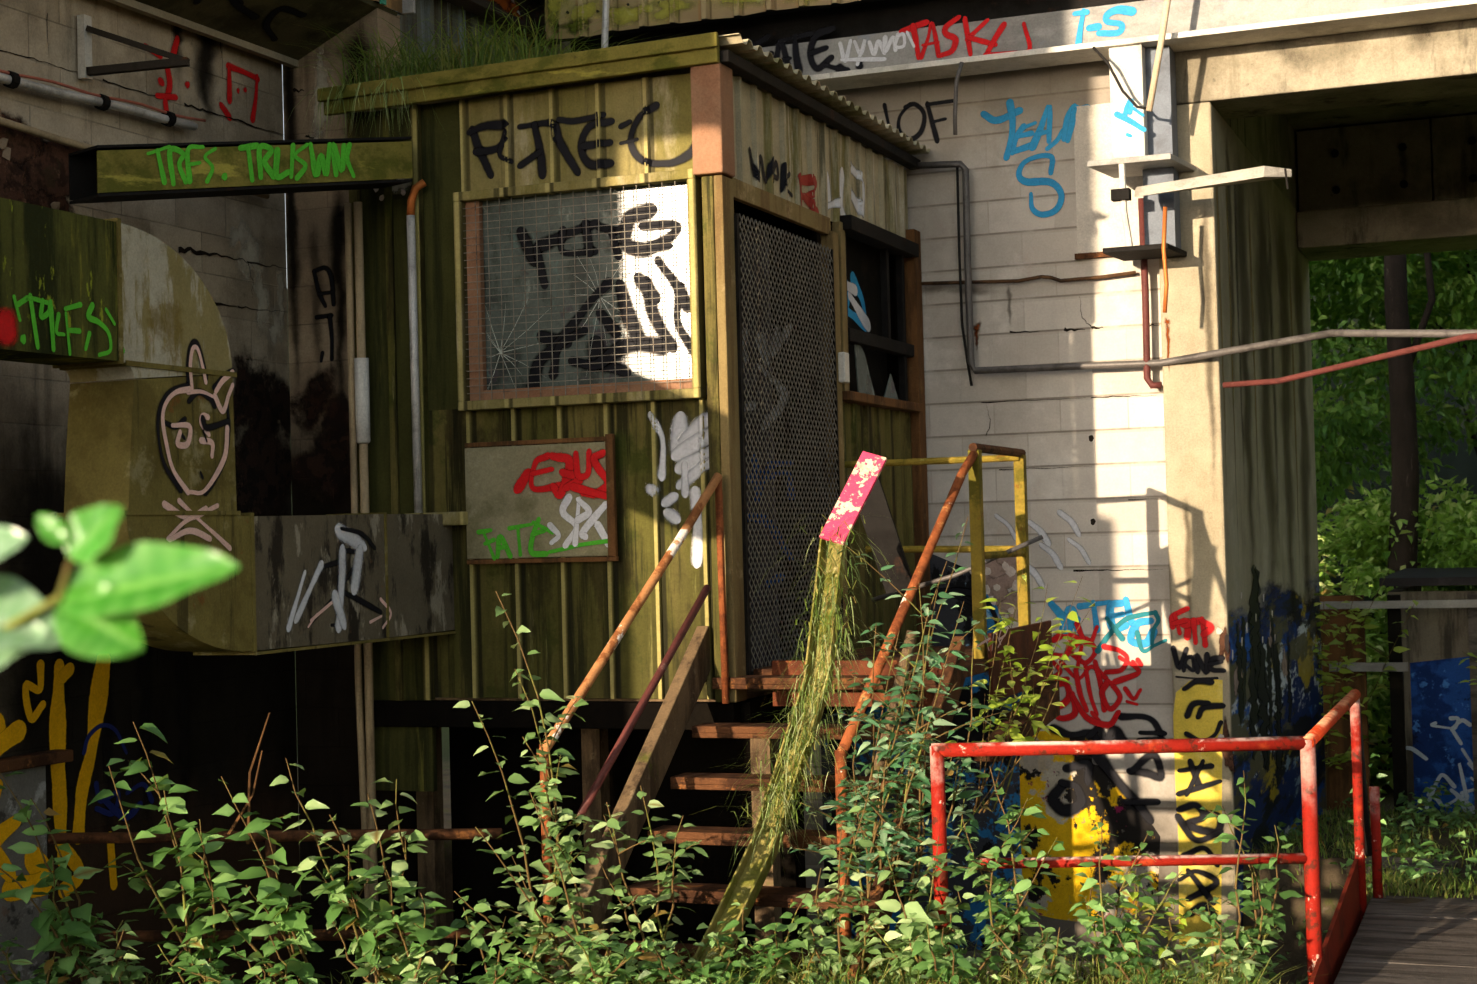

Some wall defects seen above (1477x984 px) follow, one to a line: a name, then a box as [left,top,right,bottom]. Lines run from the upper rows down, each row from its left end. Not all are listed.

water stain [173,26,216,114]
water stain [283,66,297,140]
water stain [314,36,370,139]
water stain [231,193,351,516]